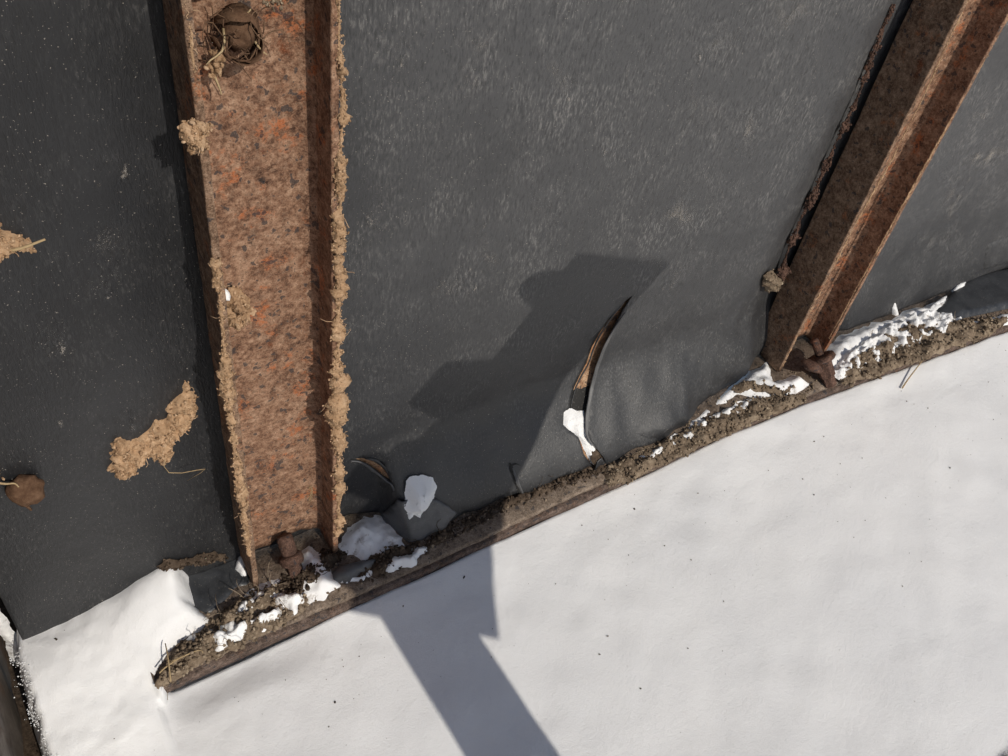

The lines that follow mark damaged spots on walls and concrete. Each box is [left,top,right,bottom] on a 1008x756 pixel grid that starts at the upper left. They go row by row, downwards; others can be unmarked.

corrosion [776,4,896,281]